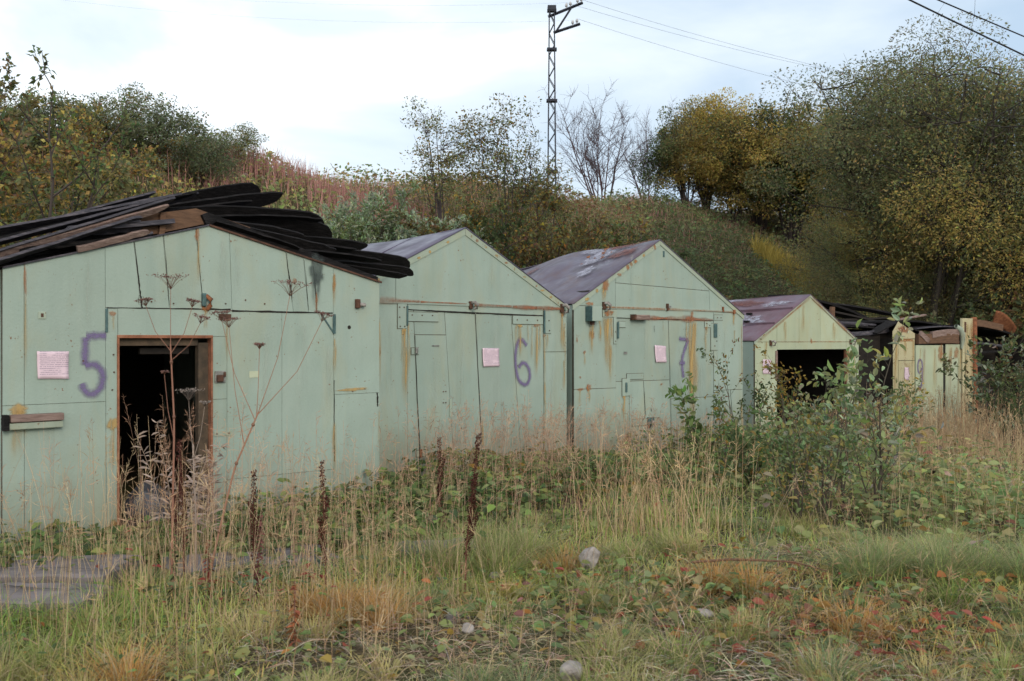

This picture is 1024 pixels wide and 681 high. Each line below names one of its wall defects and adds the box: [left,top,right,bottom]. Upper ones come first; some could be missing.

leakage [310,257,323,290]
corrosion [577,240,707,393]